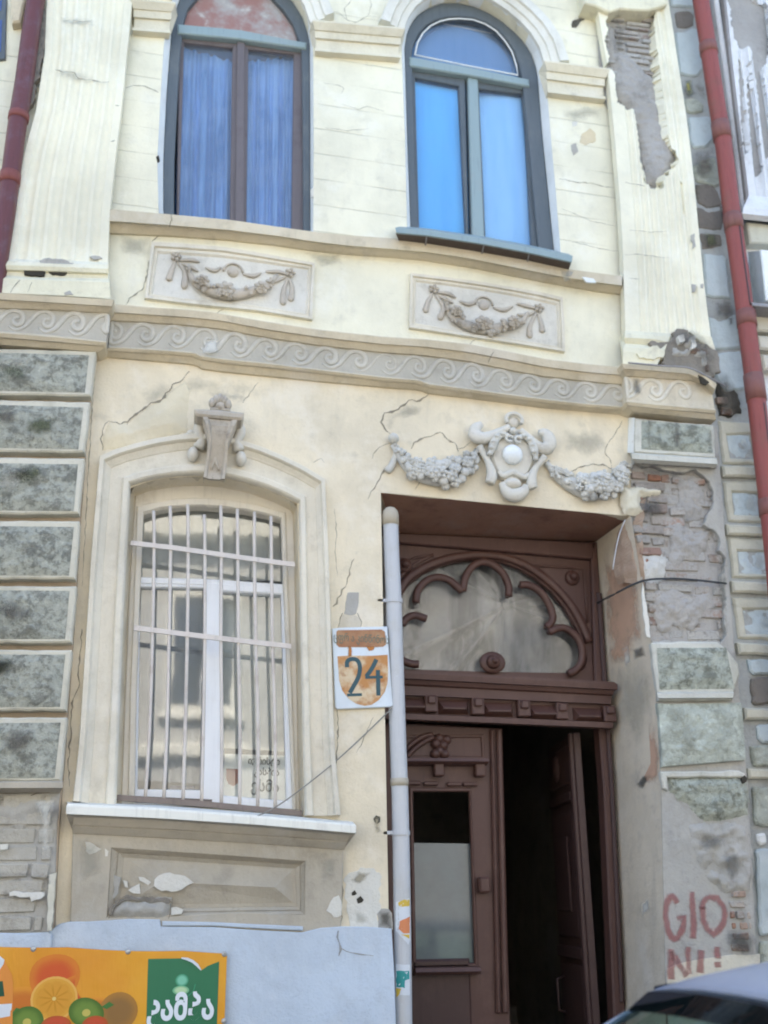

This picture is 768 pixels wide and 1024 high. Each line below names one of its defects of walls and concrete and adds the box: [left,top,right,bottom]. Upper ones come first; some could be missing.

flaking render [597,18,676,189]
crack [82,371,190,583]
crack [368,394,472,499]
crack [571,422,622,472]
flaking render [613,465,723,663]
crack [31,632,82,796]
flaking render [0,793,60,933]
spalling [108,873,193,918]
peeling [326,867,393,930]